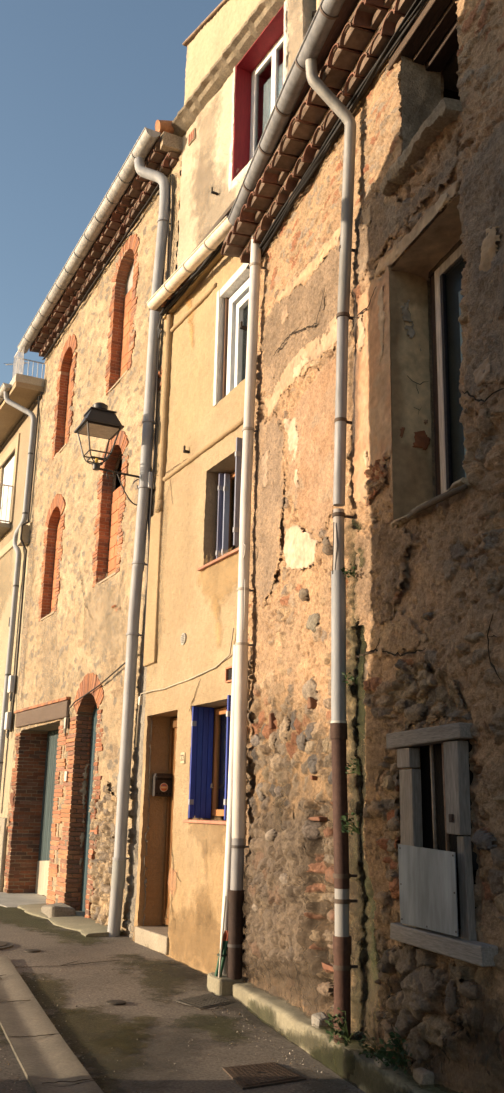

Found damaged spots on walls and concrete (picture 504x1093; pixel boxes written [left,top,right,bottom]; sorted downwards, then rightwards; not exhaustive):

crack [273,290,325,356]
flaking render [350,119,504,507]
flaking render [251,226,341,609]
flaking render [306,613,320,632]
crack [487,615,503,682]
flaking render [302,677,318,700]
flaking render [250,715,317,802]
leakage [247,999,280,1033]
spalling [374,945,480,1064]